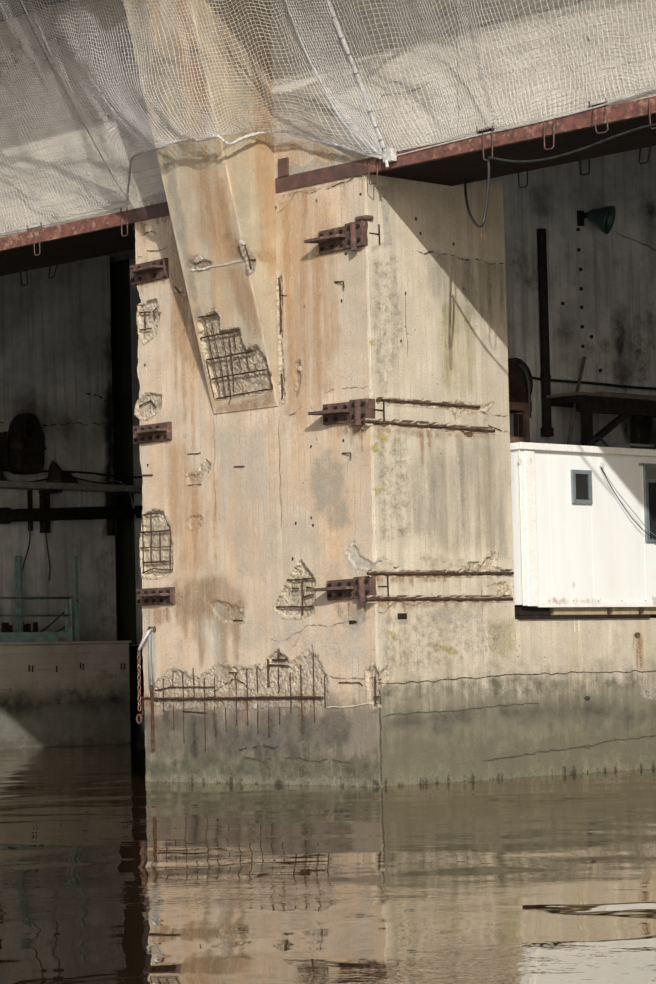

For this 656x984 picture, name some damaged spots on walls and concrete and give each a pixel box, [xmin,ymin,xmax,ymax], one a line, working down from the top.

spalling [187,256,213,272]
spalling [137,298,161,345]
spalling [197,276,302,405]
spalling [134,391,162,421]
damp [102,382,117,505]
spalling [139,508,173,580]
spalling [273,559,316,620]
spalling [141,644,389,753]